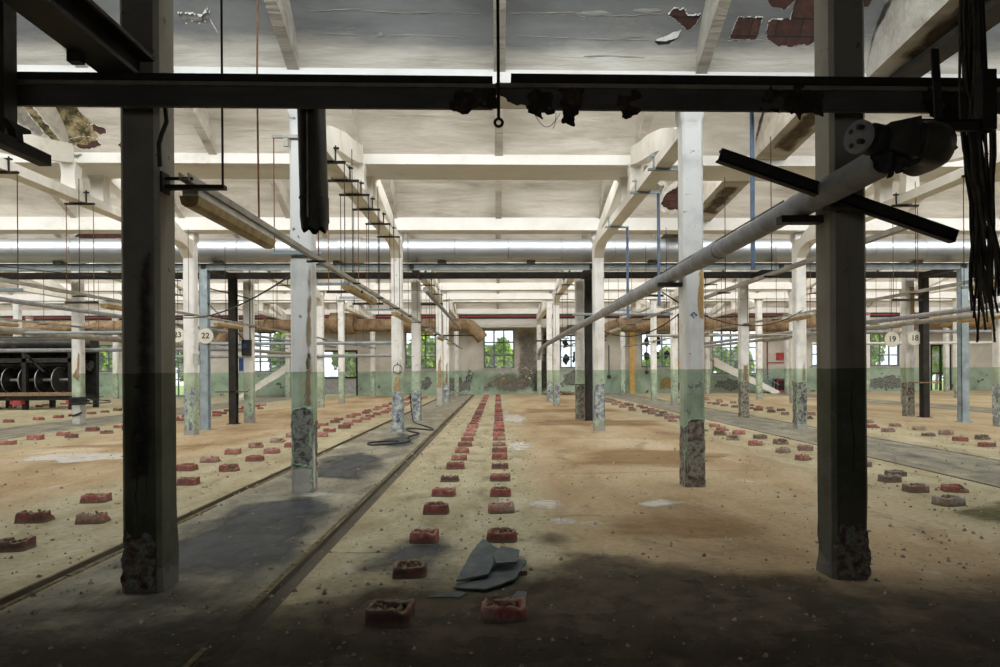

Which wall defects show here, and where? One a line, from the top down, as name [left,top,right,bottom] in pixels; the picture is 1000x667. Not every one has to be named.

peeling [177,7,218,33]
flaking render [654,7,701,45]
flaking render [728,0,814,48]
flaking render [17,107,107,149]
flaking render [650,181,678,214]
peeling [792,381,807,426]
peeling [291,406,318,493]
peeling [679,418,706,488]
spalling [120,531,157,591]
spalling [833,522,871,577]